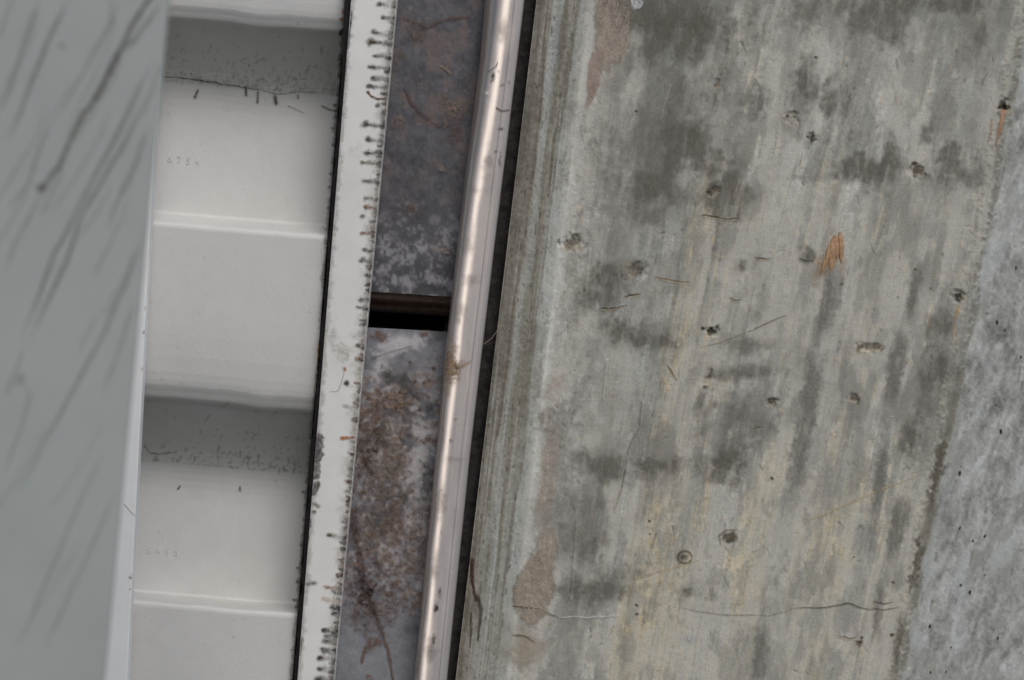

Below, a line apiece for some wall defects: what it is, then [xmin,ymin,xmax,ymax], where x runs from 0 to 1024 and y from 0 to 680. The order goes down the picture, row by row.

damp [611,0,736,62]
damp [610,111,747,221]
damp [835,143,897,181]
damp [908,275,919,309]
damp [887,340,906,394]
damp [794,374,820,474]
damp [927,442,946,500]
corrosion [340,344,471,680]
damp [889,511,908,551]
damp [909,537,924,585]
crack [801,600,897,608]